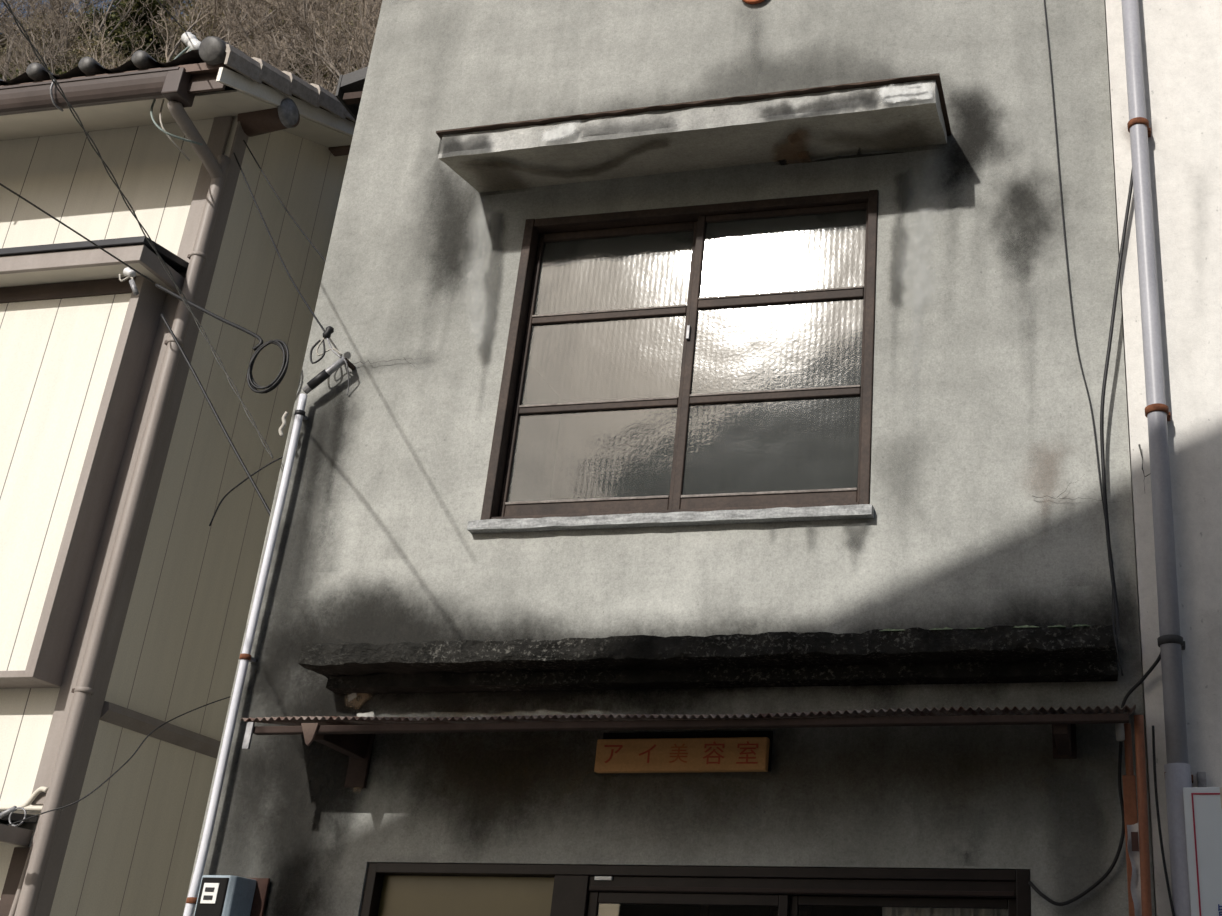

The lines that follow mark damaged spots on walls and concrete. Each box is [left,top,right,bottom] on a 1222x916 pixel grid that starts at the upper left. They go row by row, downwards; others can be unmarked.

damp [947,94,1000,184]
damp [432,170,475,274]
damp [1007,183,1050,247]
damp [480,213,503,361]